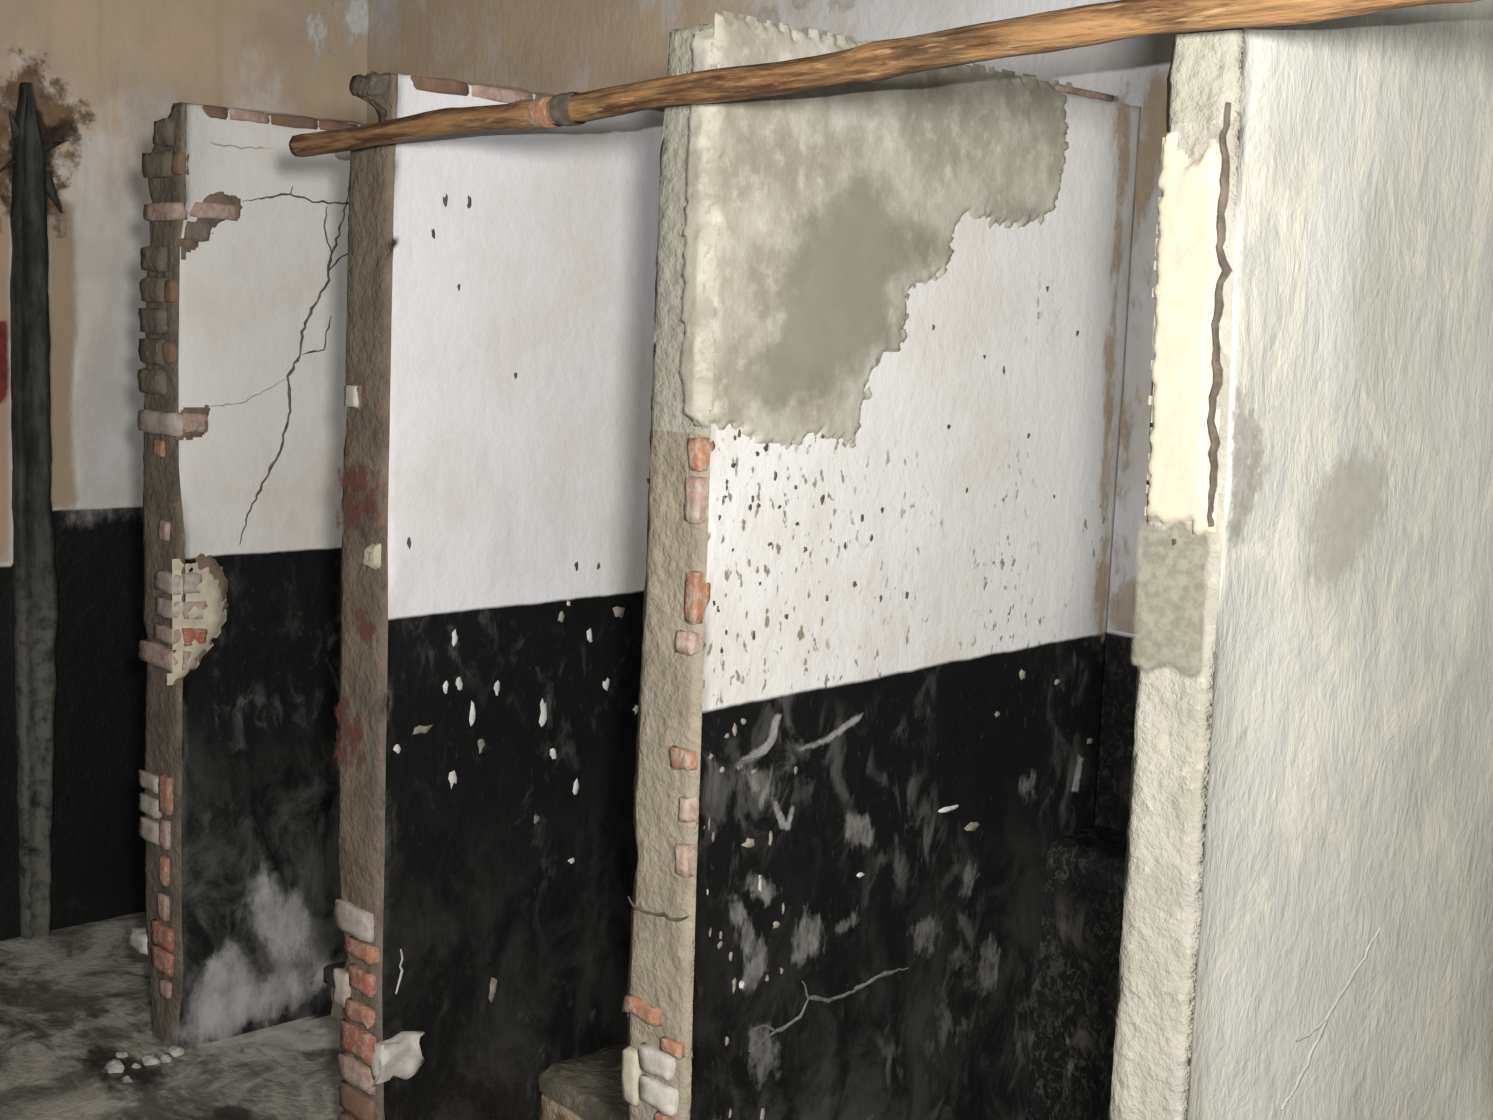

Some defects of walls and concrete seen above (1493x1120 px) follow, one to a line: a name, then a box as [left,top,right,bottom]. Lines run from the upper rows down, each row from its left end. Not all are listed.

peeling [306,0,369,54]
crack [209,187,349,545]
flaking render [158,520,171,541]
leakage [183,874,341,1058]